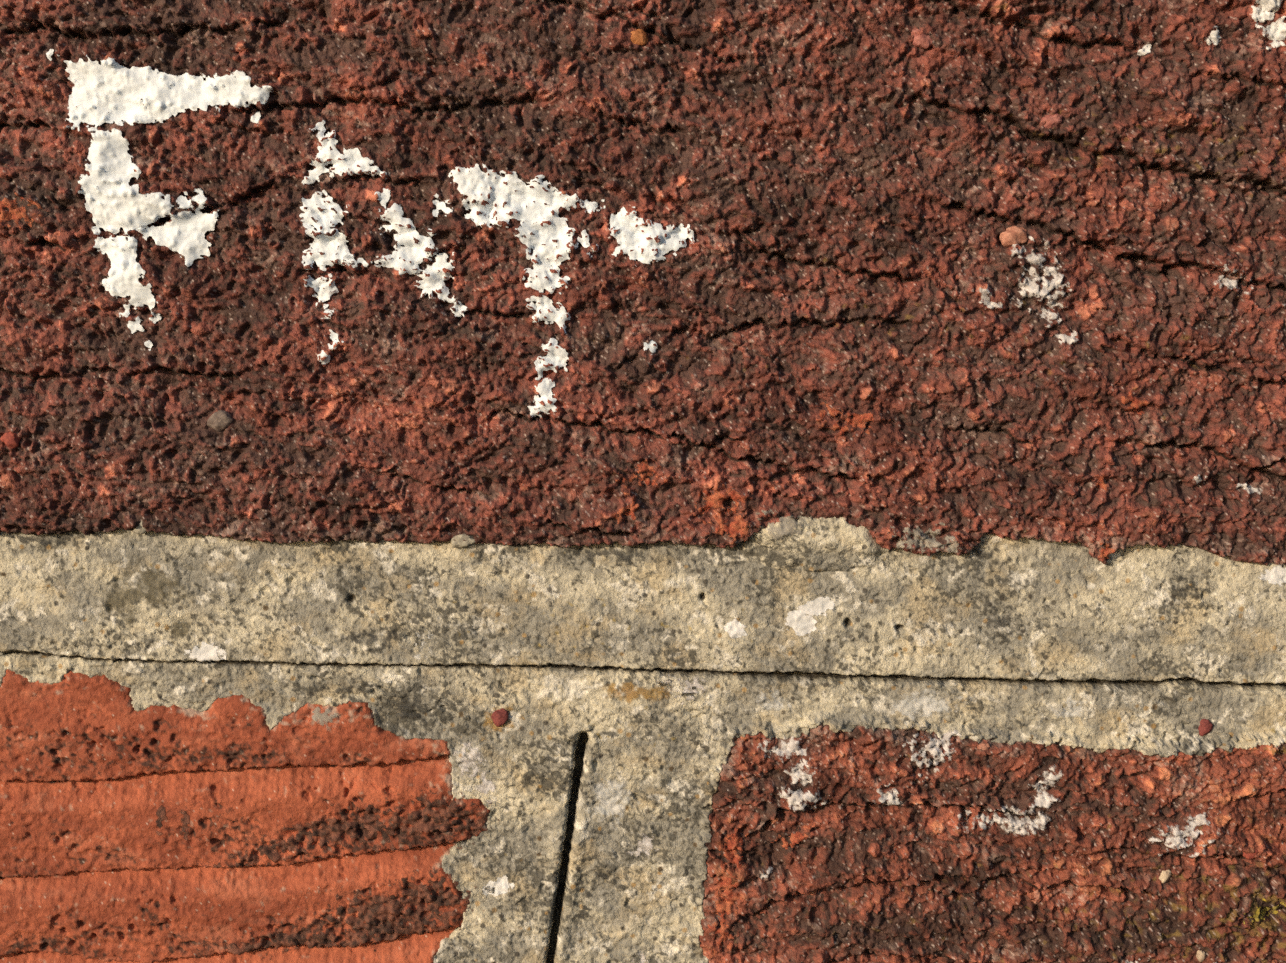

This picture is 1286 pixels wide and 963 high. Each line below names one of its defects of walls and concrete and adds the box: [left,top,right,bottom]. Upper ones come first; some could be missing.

crack [0,650,1286,687]